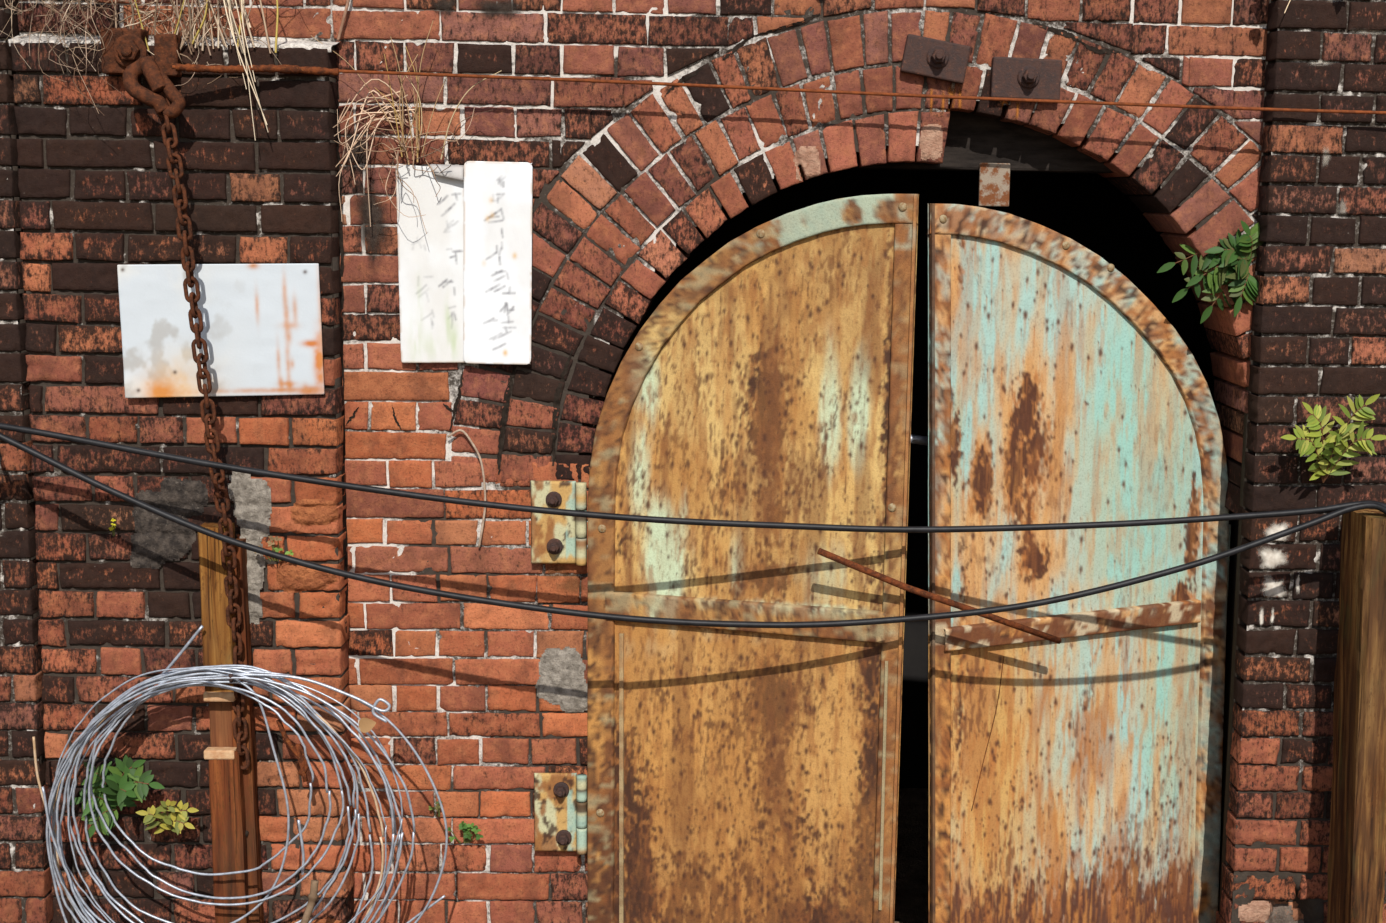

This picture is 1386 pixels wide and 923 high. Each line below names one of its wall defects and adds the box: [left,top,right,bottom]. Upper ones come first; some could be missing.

spalling [130,477,208,569]
peeling [228,471,341,624]
peeling [535,647,587,712]